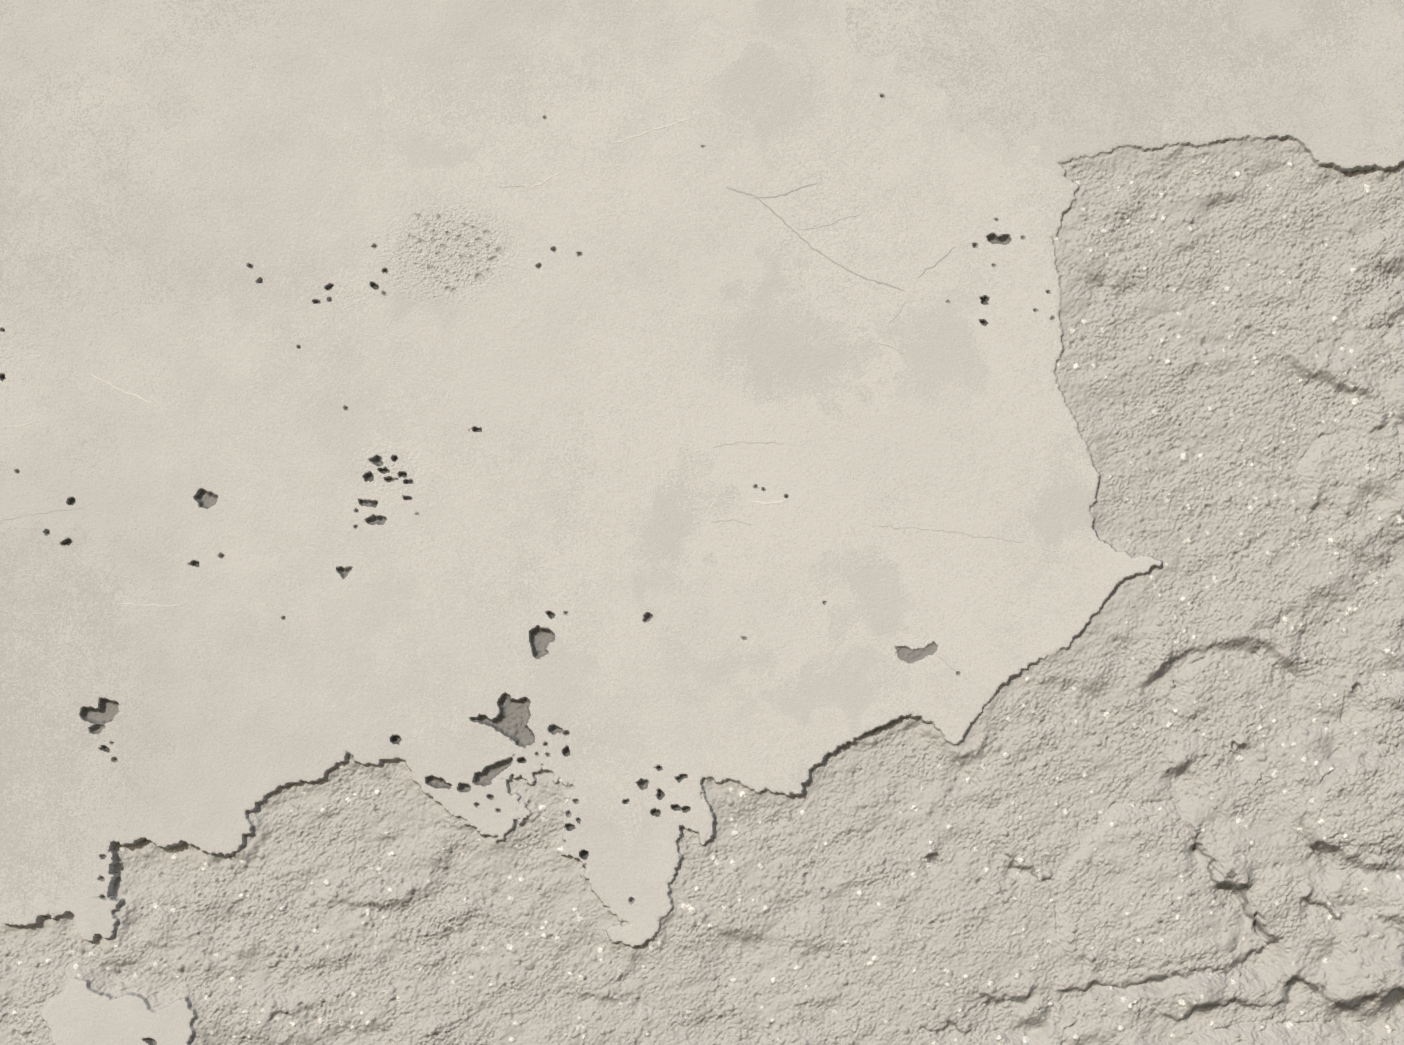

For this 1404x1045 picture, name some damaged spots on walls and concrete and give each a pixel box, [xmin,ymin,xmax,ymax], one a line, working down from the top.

crack [725,183,954,356]
hole [363,455,420,516]
hole [530,612,569,659]
spalling [1149,638,1300,682]
hole [80,698,120,763]
spalling [470,693,535,749]
hole [458,755,527,793]
hole [637,766,691,817]
spalling [1297,814,1404,874]
spalling [1055,801,1249,974]
spalling [1216,883,1275,937]
spalling [1266,977,1404,1012]